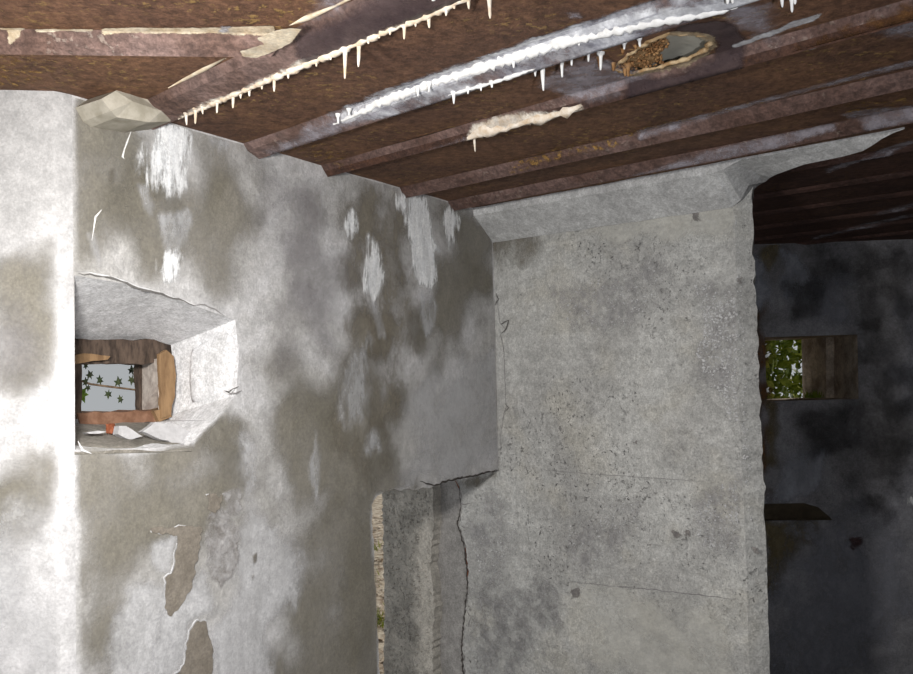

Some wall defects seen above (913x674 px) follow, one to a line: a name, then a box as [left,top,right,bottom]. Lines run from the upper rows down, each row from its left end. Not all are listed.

leakage [331,0,819,141]
peeling [607,35,715,84]
leakage [77,0,470,293]
leakage [0,258,52,383]
leakage [755,259,770,308]
corrosion [757,307,769,370]
crack [420,283,509,674]
corrosion [759,381,777,471]
peeling [151,493,242,616]
peeling [172,619,213,674]